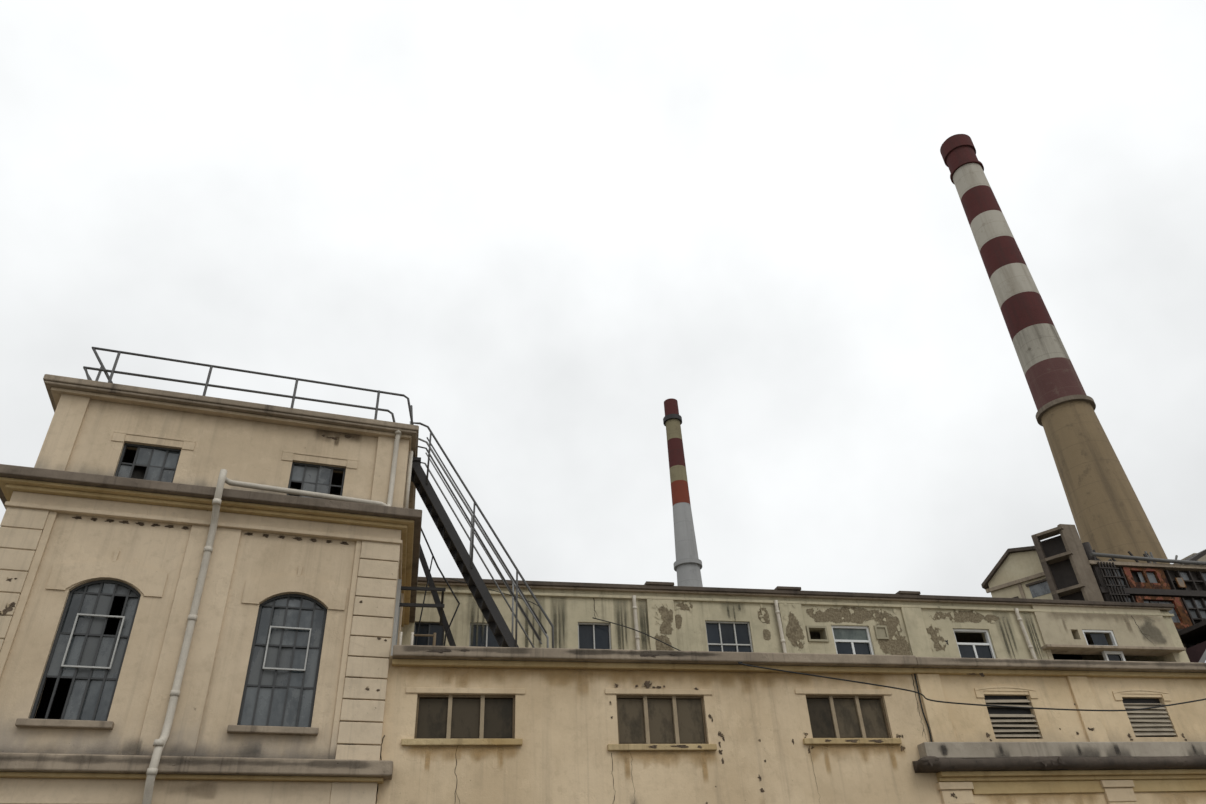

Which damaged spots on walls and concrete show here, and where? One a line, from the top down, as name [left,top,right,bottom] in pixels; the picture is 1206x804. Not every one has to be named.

leakage [525,613,564,648]
peeling [640,601,693,657]
peeling [758,603,911,655]
peeling [926,610,1004,652]